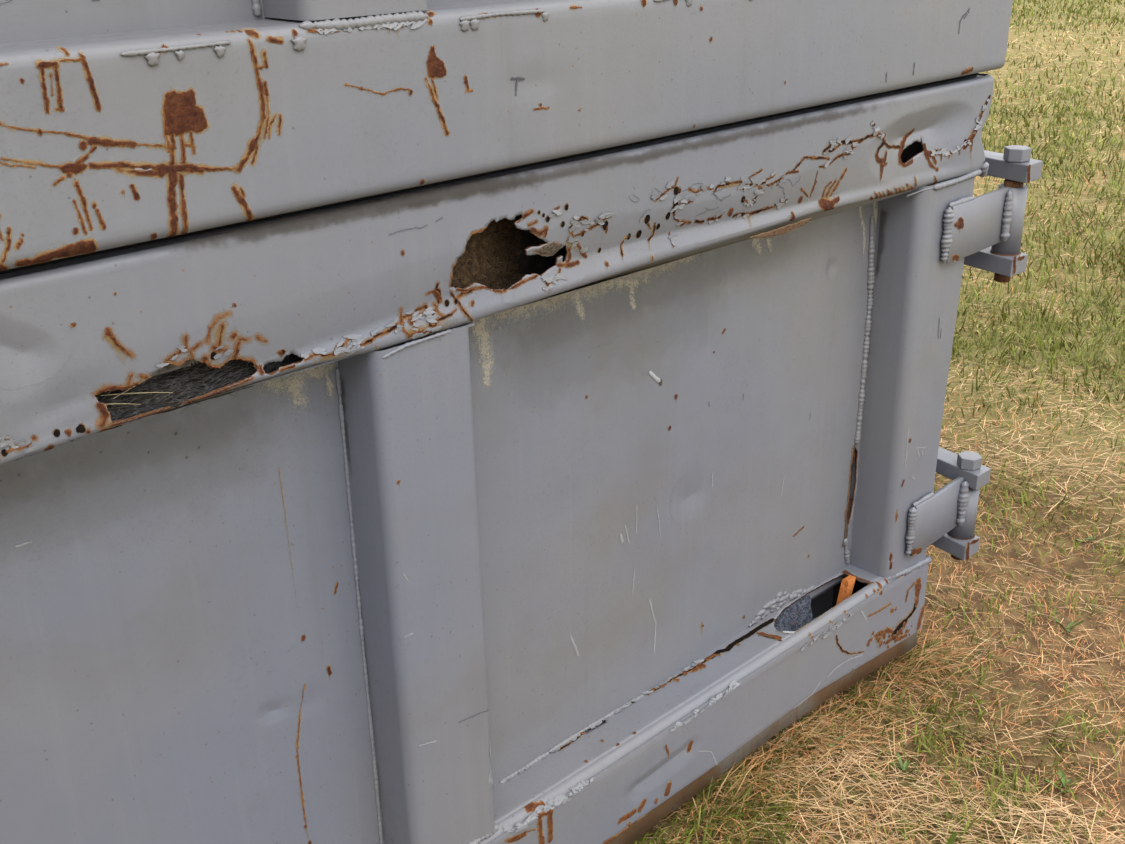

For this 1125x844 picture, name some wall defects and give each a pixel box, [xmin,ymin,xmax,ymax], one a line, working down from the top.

corrosion [0,21,338,271]
corrosion [870,151,917,200]
corrosion [924,150,939,185]
corrosion [749,167,847,238]
peeling [541,272,553,291]
peeling [151,345,201,377]
corrosion [866,553,924,648]
corrosion [505,800,554,844]
corrosion [603,781,672,844]